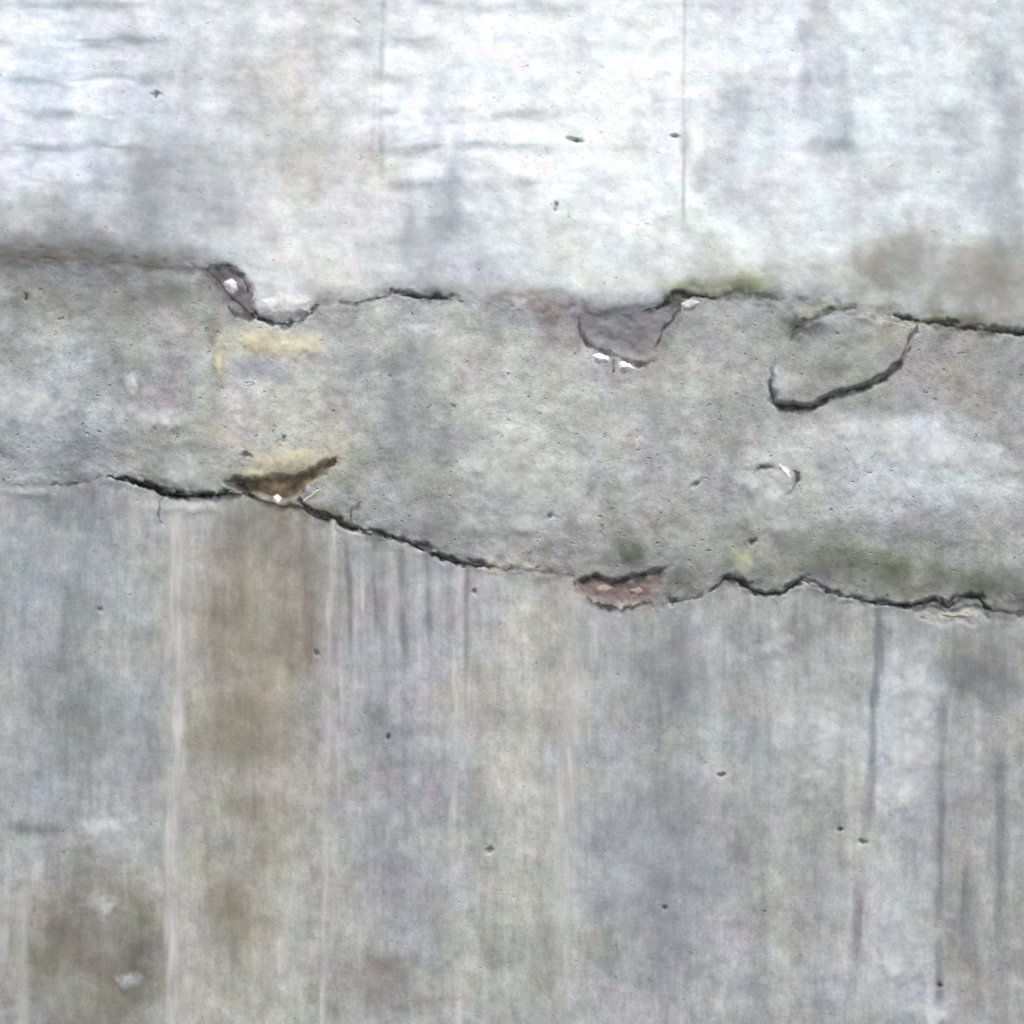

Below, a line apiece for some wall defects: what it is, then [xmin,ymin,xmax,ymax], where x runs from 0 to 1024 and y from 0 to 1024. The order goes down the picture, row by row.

spalling [209,264,318,328]
spalling [578,299,701,373]
crack [769,314,1024,410]
leakage [125,374,182,428]
crack [53,476,229,510]
spalling [224,460,335,519]
crack [298,501,512,571]
spalling [573,572,660,612]
crack [675,574,985,612]
leakage [172,685,184,786]
leakage [886,662,934,808]
leakage [913,1002,947,1024]